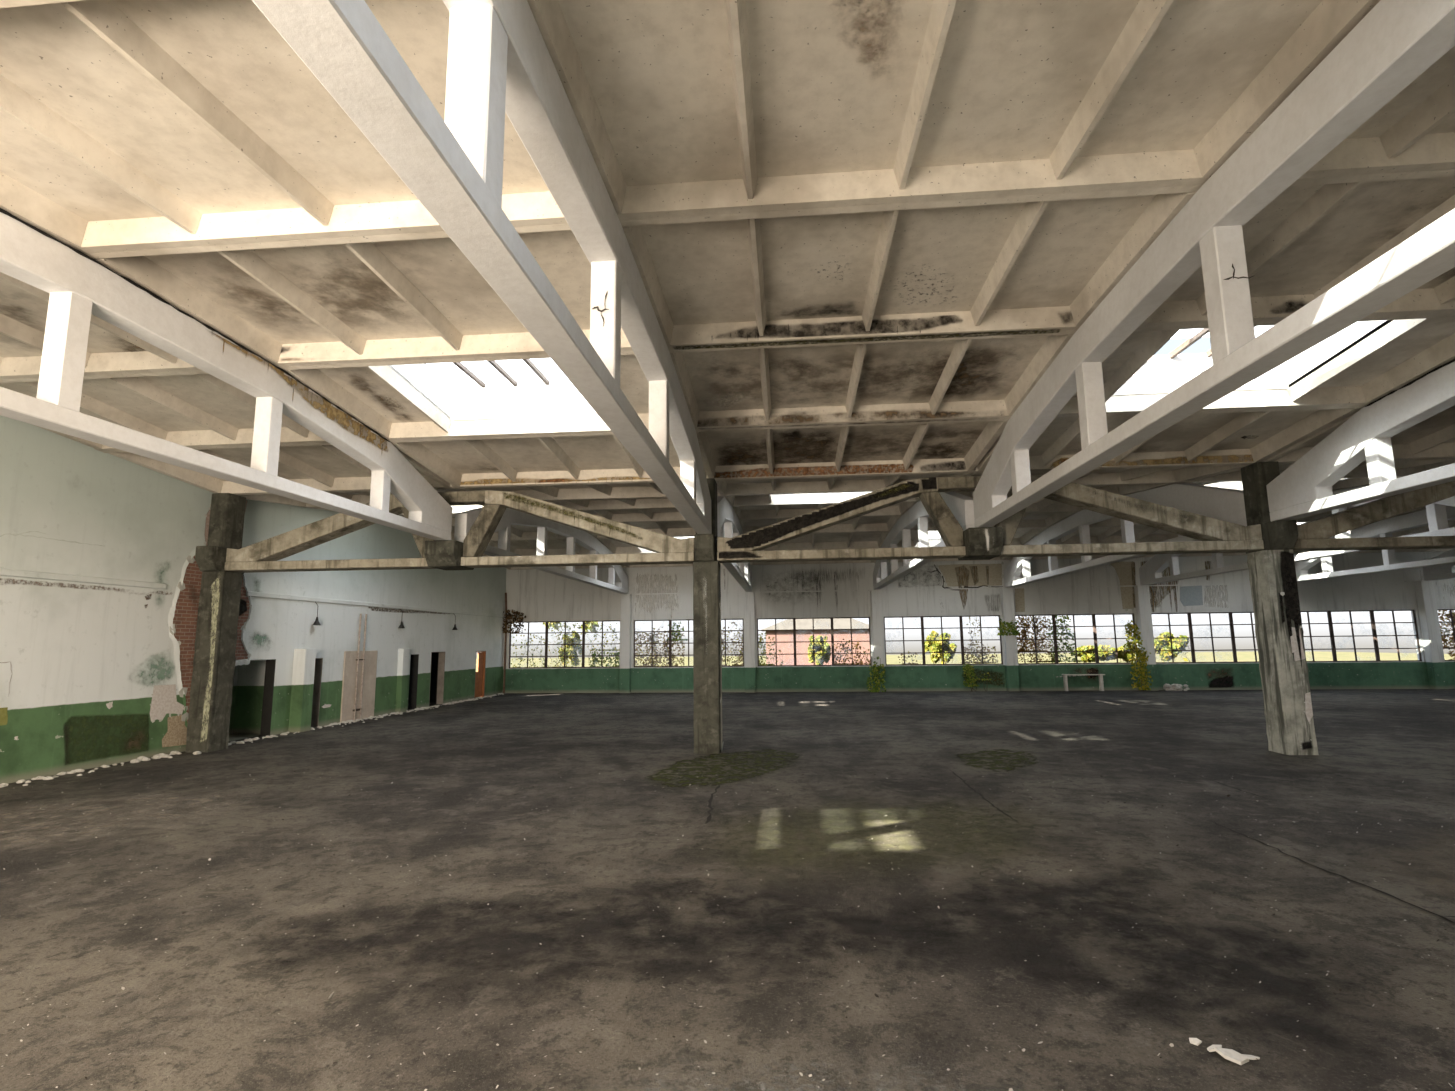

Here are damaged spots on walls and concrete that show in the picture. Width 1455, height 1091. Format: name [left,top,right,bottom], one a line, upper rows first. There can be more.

damp [674,272,1071,465]
damp [719,477,937,572]
flaking render [235,573,255,667]